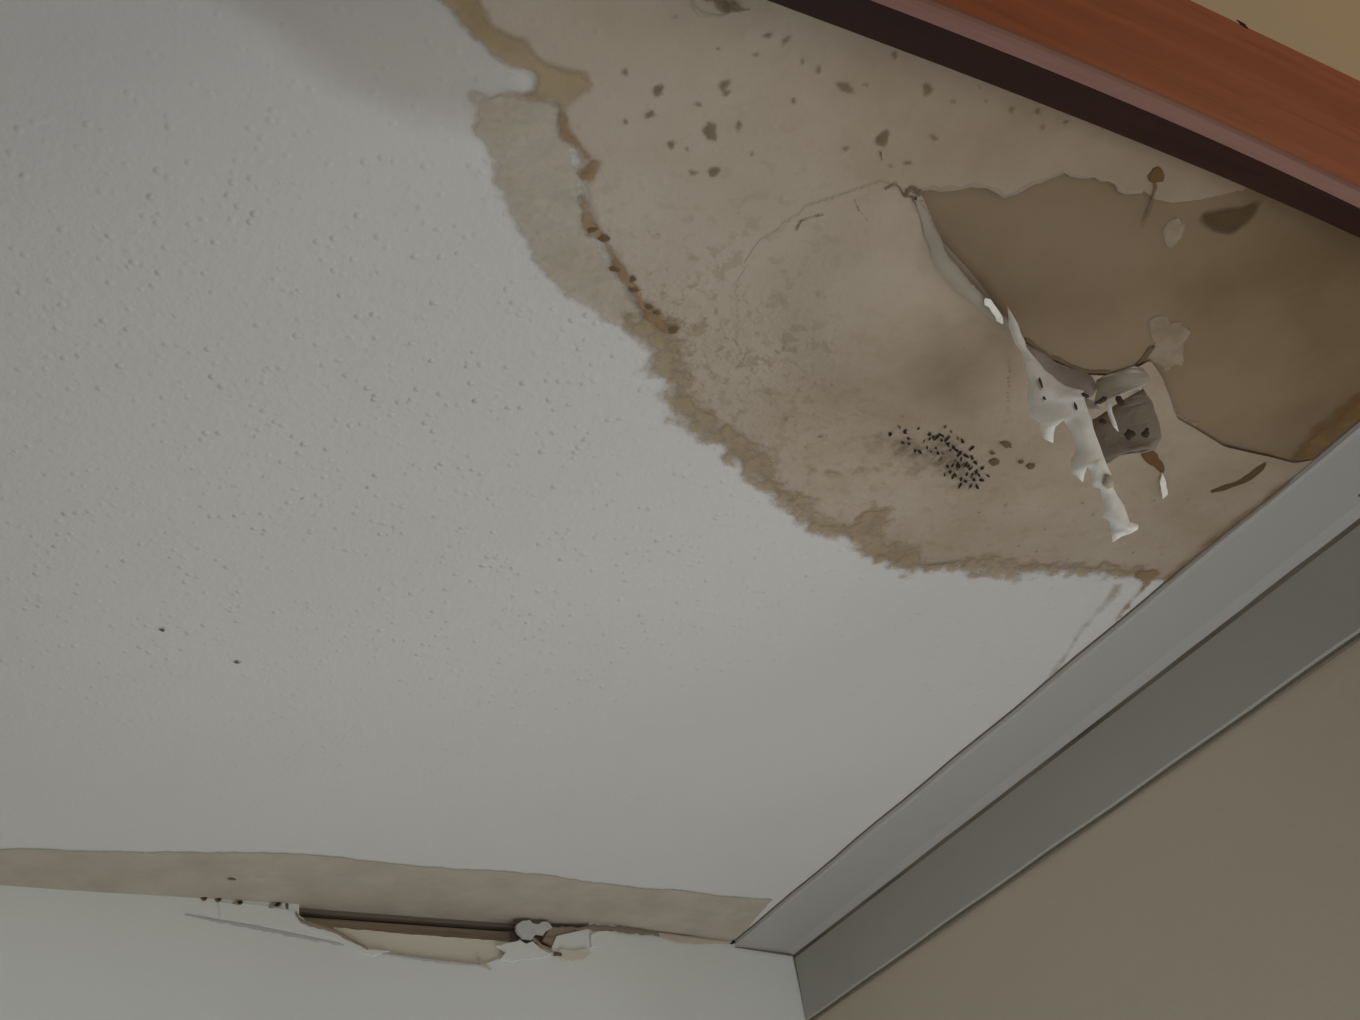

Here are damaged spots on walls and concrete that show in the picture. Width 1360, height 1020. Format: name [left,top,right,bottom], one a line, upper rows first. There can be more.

water stain [444,0,1313,597]
peeling [1007,306,1161,542]
flaking render [269,902,614,970]